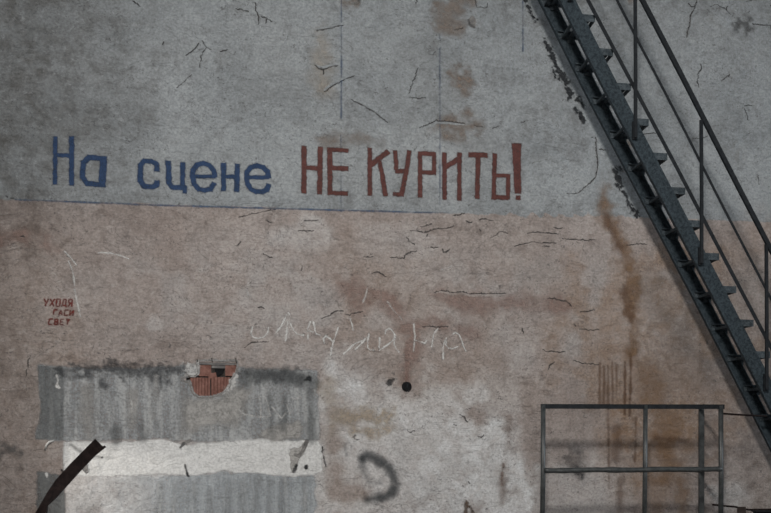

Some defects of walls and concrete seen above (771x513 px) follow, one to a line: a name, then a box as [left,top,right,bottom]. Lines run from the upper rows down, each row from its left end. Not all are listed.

crack [686,0,771,38]
crack [176,41,228,88]
crack [315,62,389,123]
crack [419,119,465,131]
crack [692,135,710,143]
crack [566,137,605,197]
crack [346,213,595,276]
crack [434,290,505,298]
crack [322,310,363,321]
flaking render [180,358,239,399]